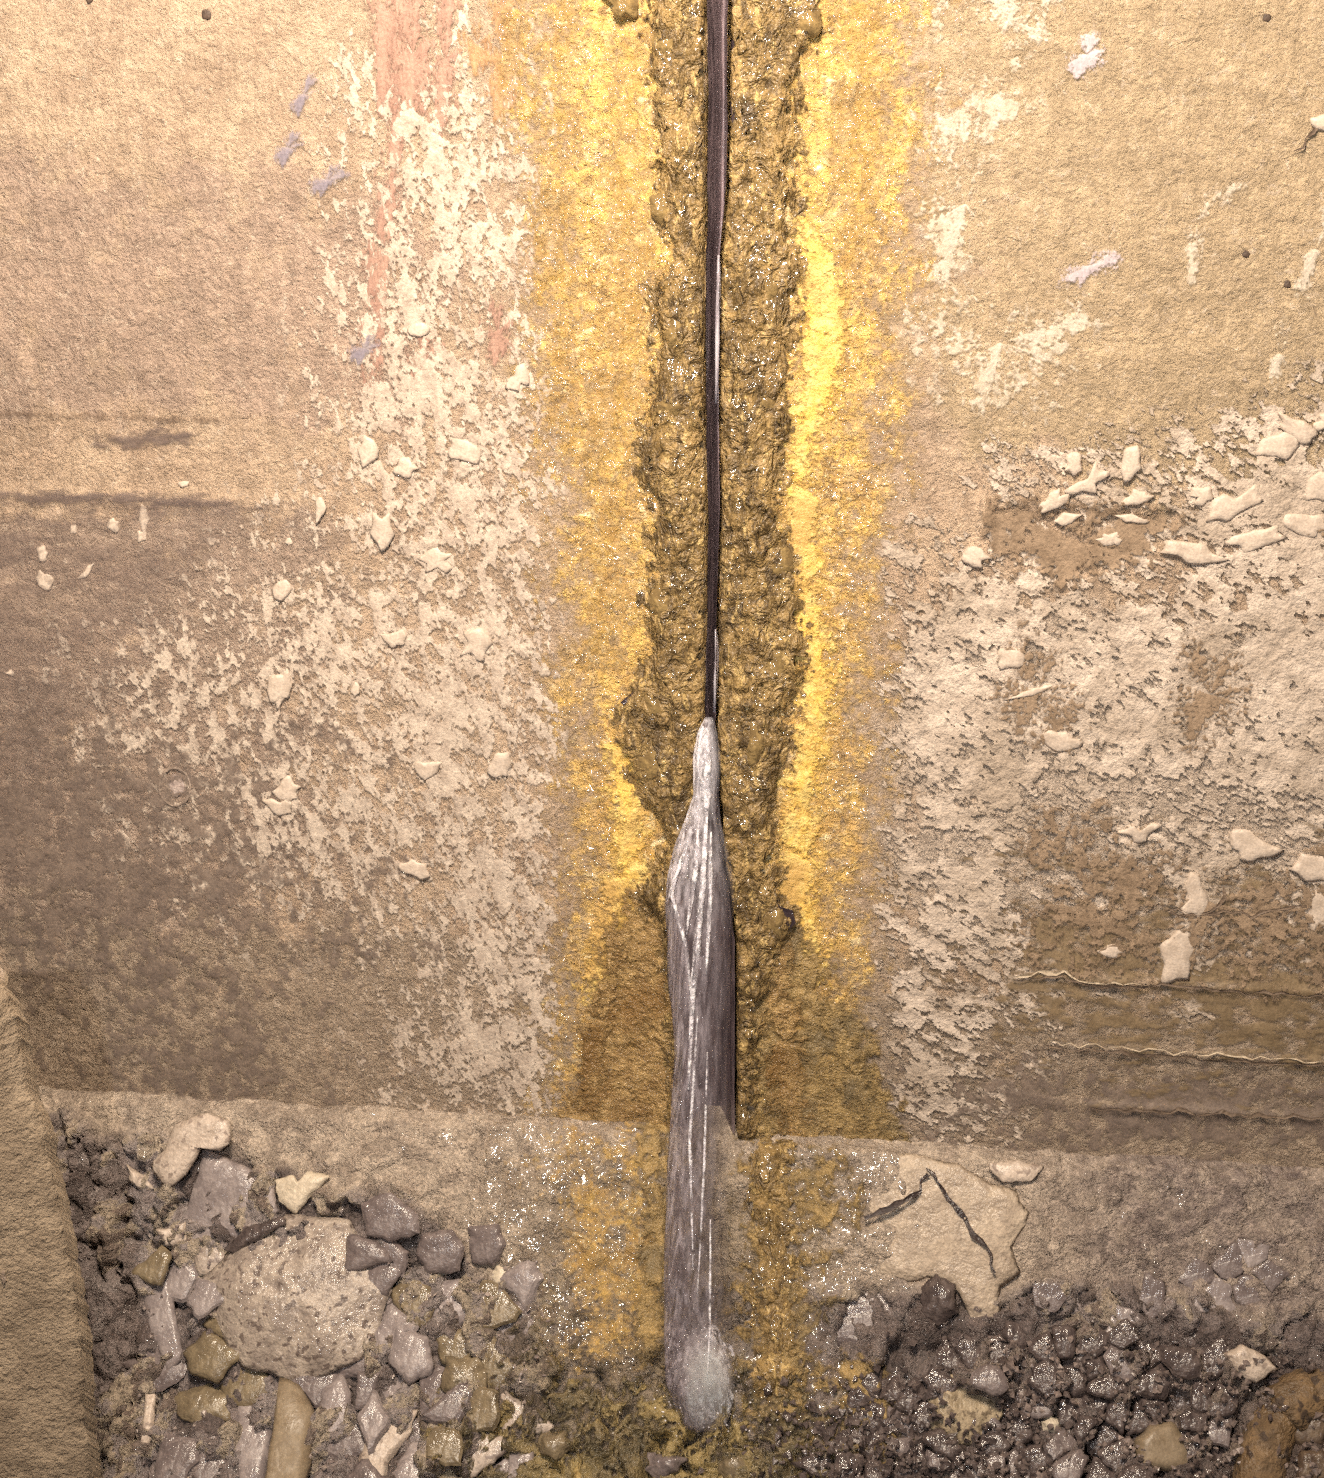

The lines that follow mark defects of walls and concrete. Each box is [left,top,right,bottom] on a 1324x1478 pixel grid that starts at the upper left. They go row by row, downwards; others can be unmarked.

water stain [904,80,1101,422]
crack [1294,114,1324,151]
water stain [0,0,924,1478]
peeling [871,358,1324,1151]
water stain [921,866,1324,1165]
crack [864,1168,996,1273]